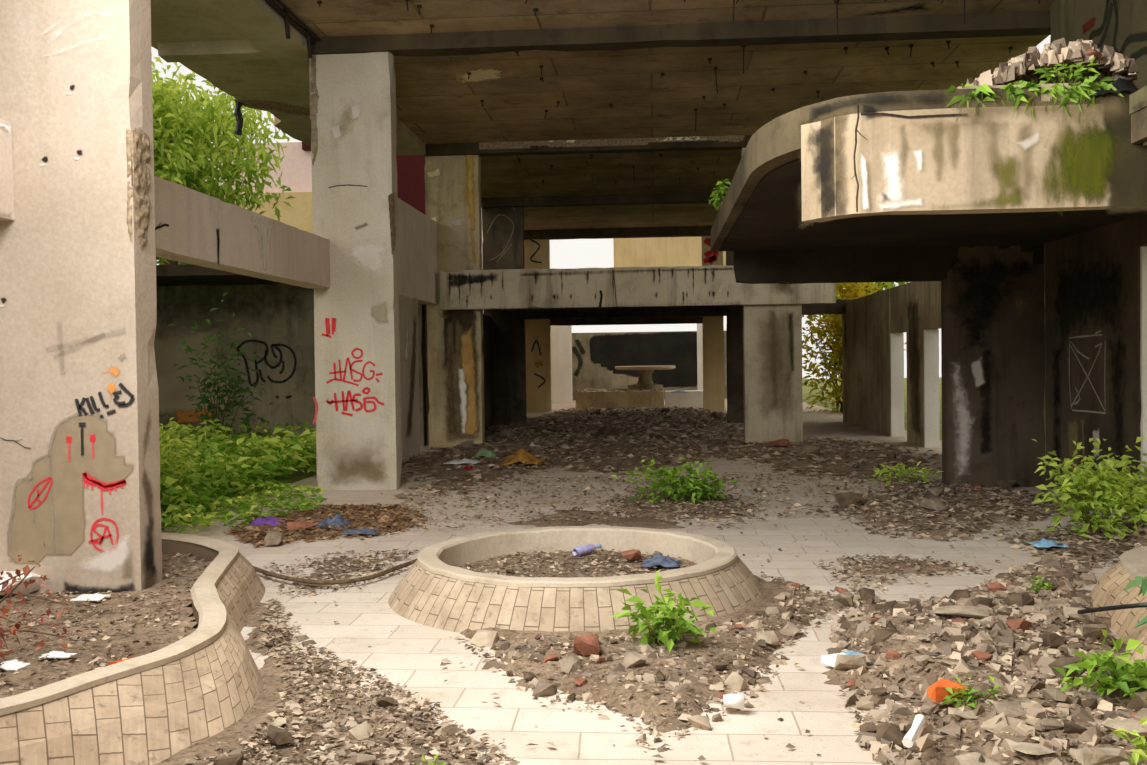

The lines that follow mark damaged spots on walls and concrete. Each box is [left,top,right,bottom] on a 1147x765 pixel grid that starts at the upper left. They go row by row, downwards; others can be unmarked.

spalling [126,127,151,252]
damp [804,94,942,223]
damp [935,126,956,170]
damp [981,147,1029,207]
damp [612,268,732,302]